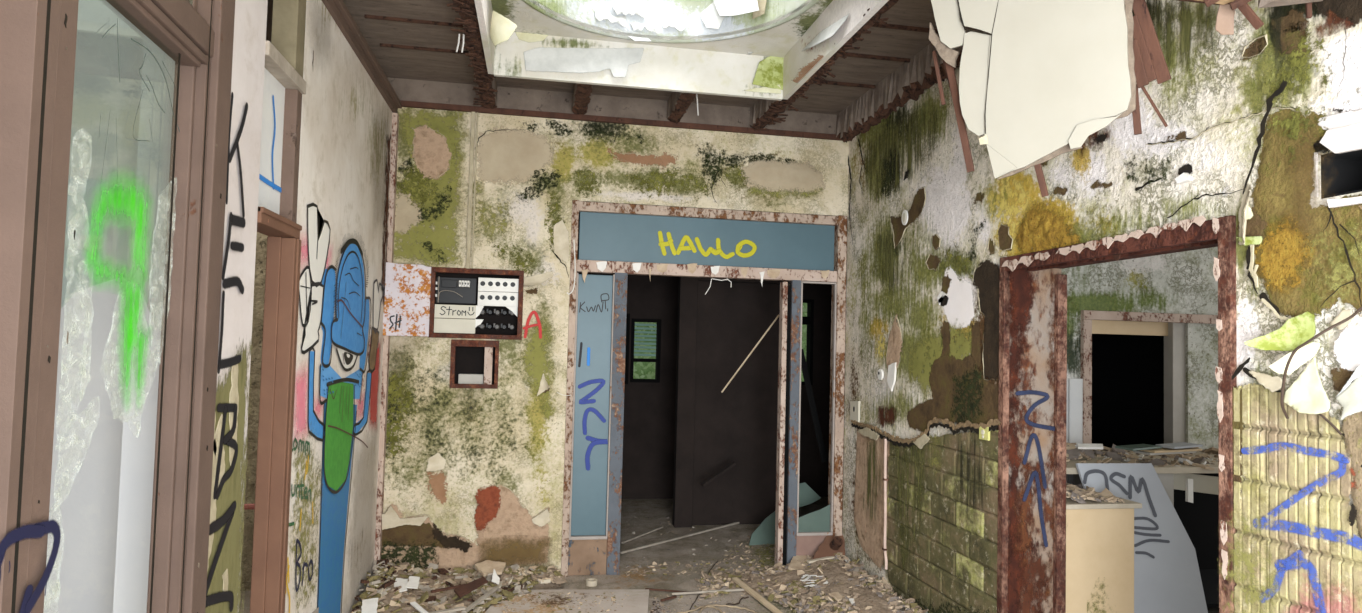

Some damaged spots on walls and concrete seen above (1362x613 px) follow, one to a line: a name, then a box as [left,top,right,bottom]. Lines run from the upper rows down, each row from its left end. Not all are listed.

peeling [490,0,767,77]
water stain [517,169,561,201]
water stain [519,119,644,144]
water stain [695,142,796,188]
spalling [997,0,1136,180]
water stain [1294,139,1321,230]
crack [1246,246,1288,317]
crack [1319,207,1362,314]
flaking render [1232,109,1362,613]
rust [1005,268,1055,613]
spalling [381,484,550,577]
flaking render [851,417,1001,613]